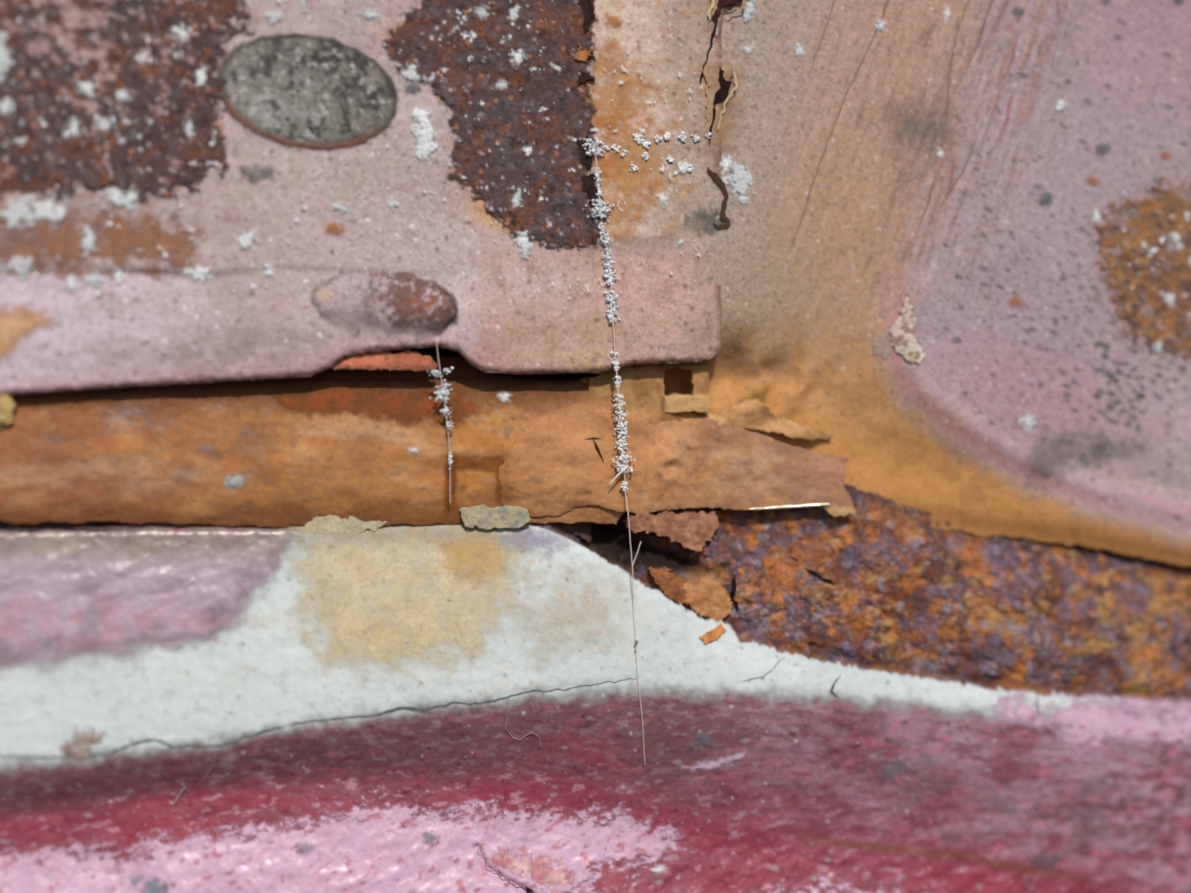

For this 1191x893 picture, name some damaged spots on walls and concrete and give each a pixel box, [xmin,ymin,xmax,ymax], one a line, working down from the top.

rust [0,0,256,280]
rust [383,0,660,251]
rust [276,386,476,425]
rust [445,457,505,510]
peeling [872,292,926,364]
rust [1095,176,1191,365]
crack [0,678,639,759]
peeling [0,504,1191,771]
rust [513,483,1191,702]
crack [477,847,533,893]